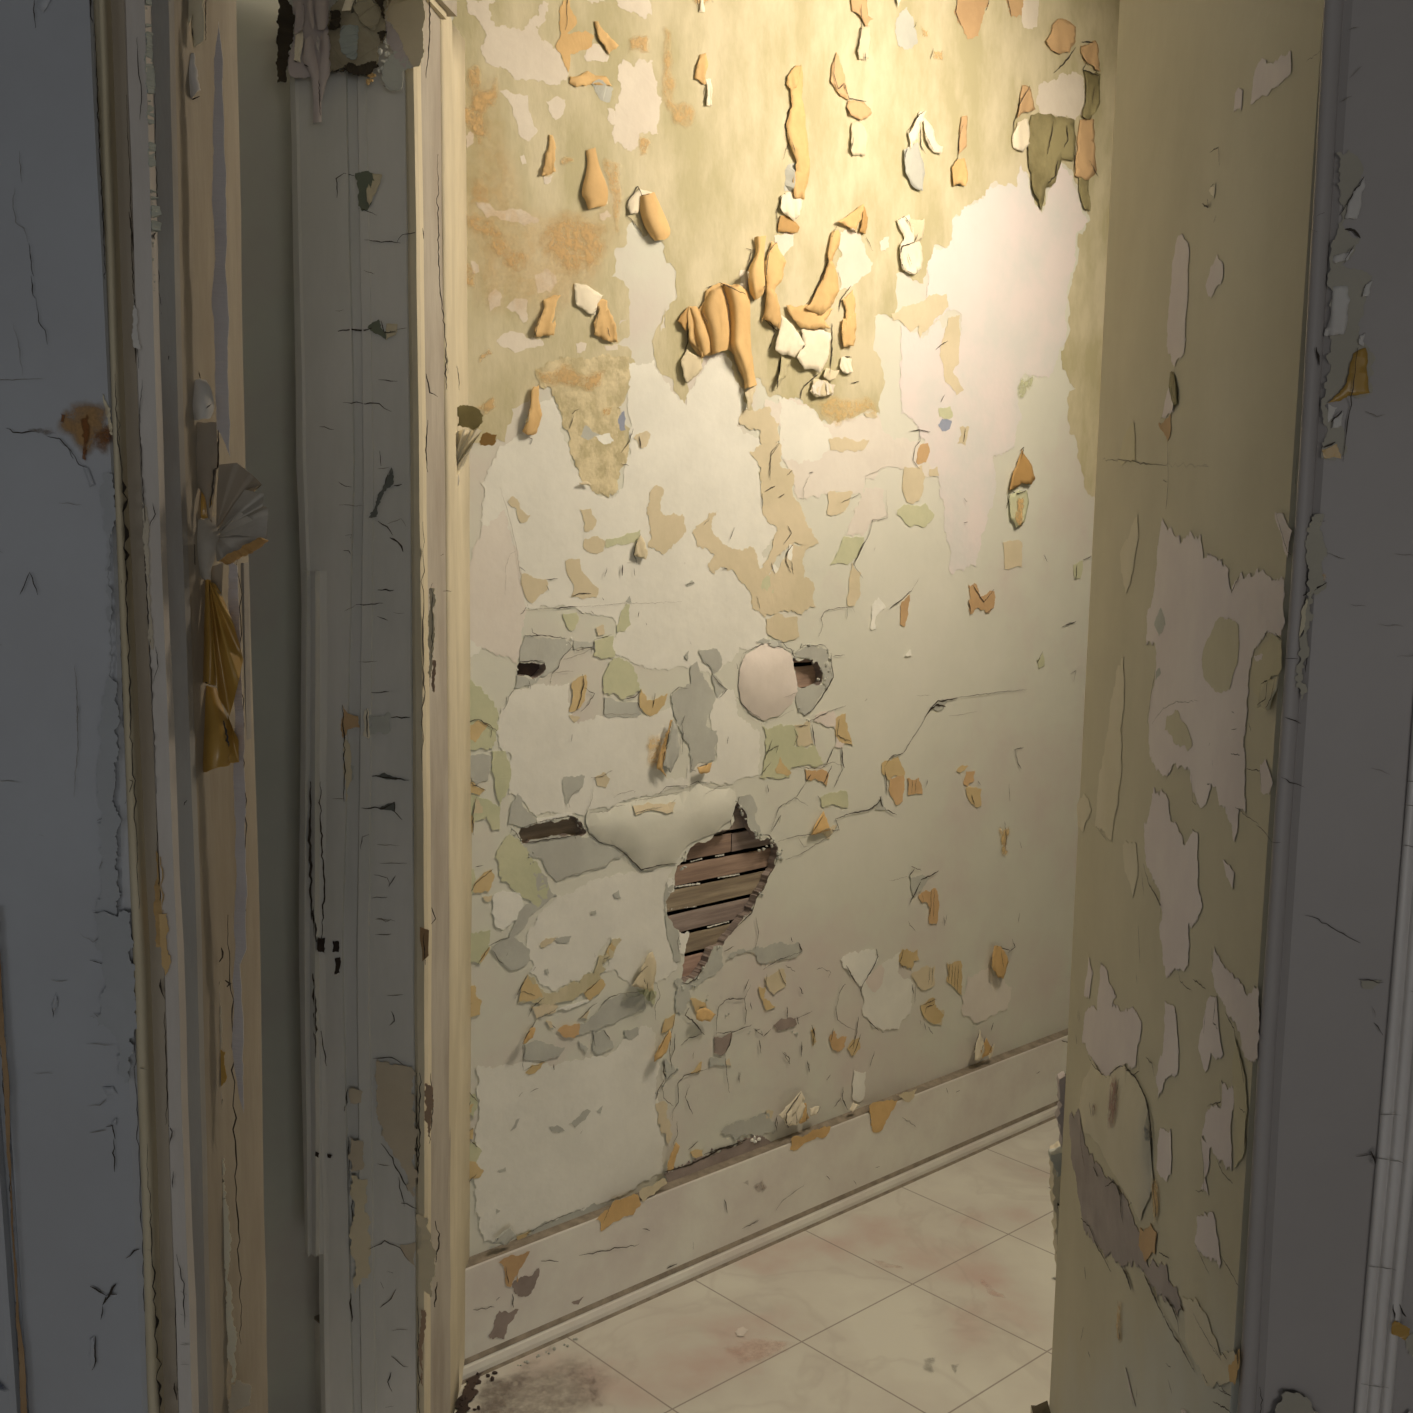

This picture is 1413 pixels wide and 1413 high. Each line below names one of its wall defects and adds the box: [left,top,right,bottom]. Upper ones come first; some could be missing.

crack [0,151,48,380]
peeling [212,22,230,456]
crack [0,961,52,1413]
crack [91,1118,116,1172]
peeling [341,533,436,801]
peeling [344,1057,440,1413]
peeling [452,0,1120,1038]
crack [763,621,1076,860]
crack [1073,556,1091,579]
peeling [1062,957,1142,1076]
flaking render [1048,1071,1240,1413]
peeling [1123,518,1285,1195]